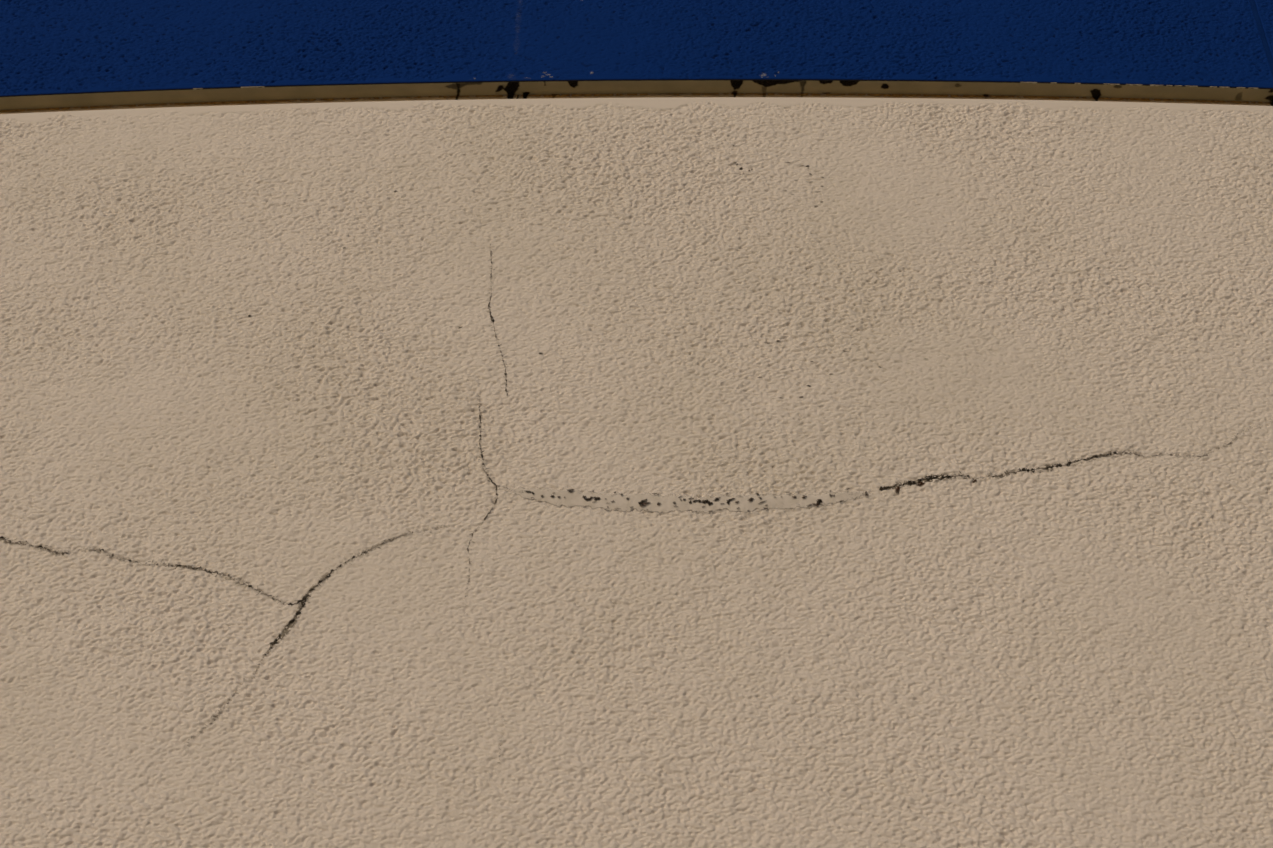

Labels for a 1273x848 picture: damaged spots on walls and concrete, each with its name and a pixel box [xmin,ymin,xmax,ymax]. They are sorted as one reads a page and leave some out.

crack [467,252,508,552]
crack [879,451,1138,491]
crack [0,531,413,671]